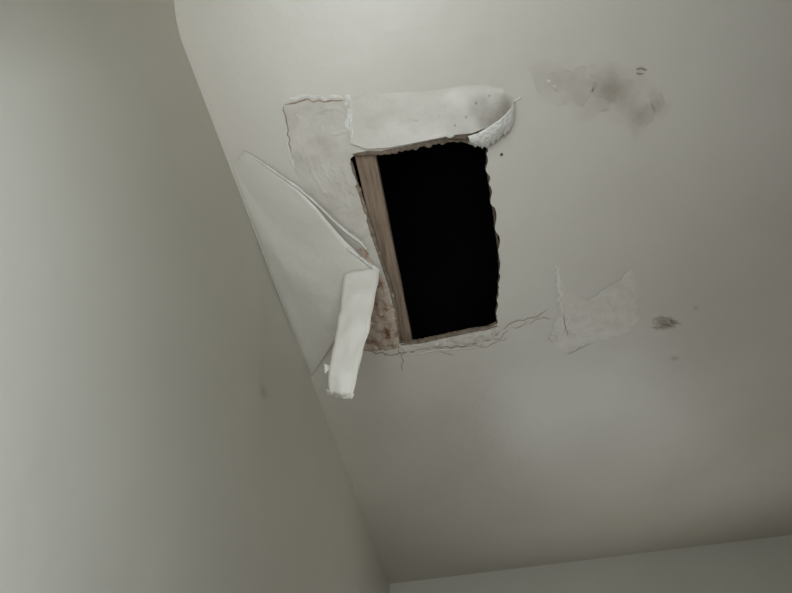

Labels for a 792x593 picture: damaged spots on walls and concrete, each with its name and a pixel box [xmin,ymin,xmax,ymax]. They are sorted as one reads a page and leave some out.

peeling [233,93,522,400]
crack [364,310,549,371]